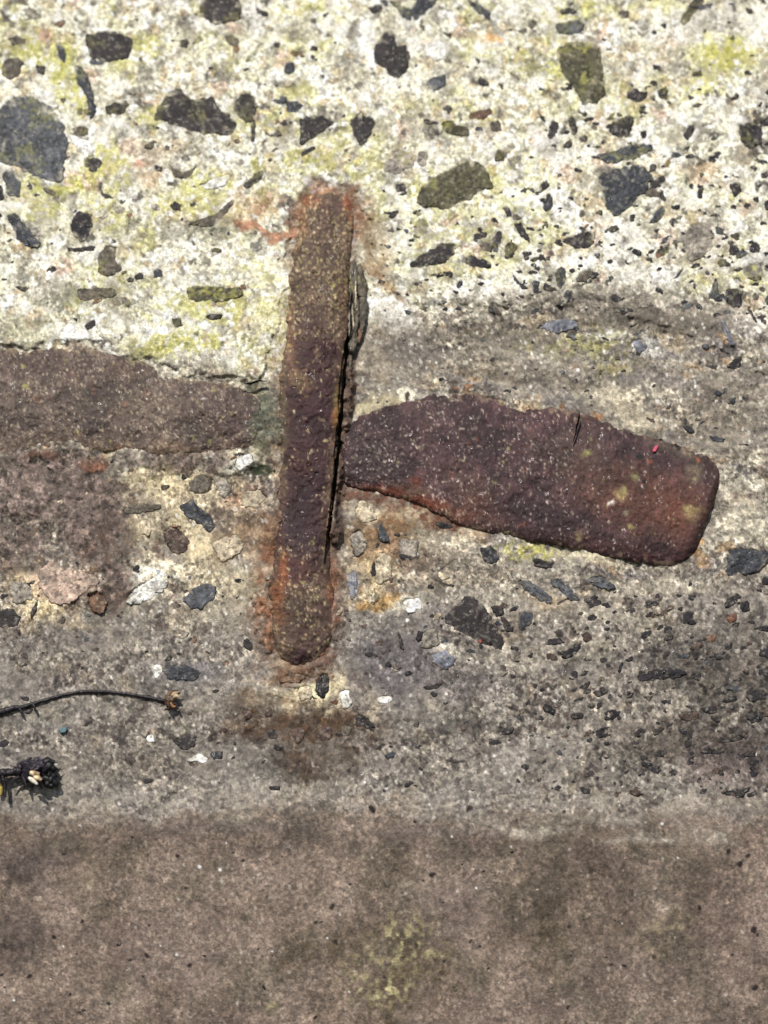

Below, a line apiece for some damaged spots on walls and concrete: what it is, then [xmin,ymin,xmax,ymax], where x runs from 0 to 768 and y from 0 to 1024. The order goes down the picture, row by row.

corrosion [235,184,367,259]
corrosion [254,516,283,652]
crack [326,290,352,551]
corrosion [326,355,462,590]